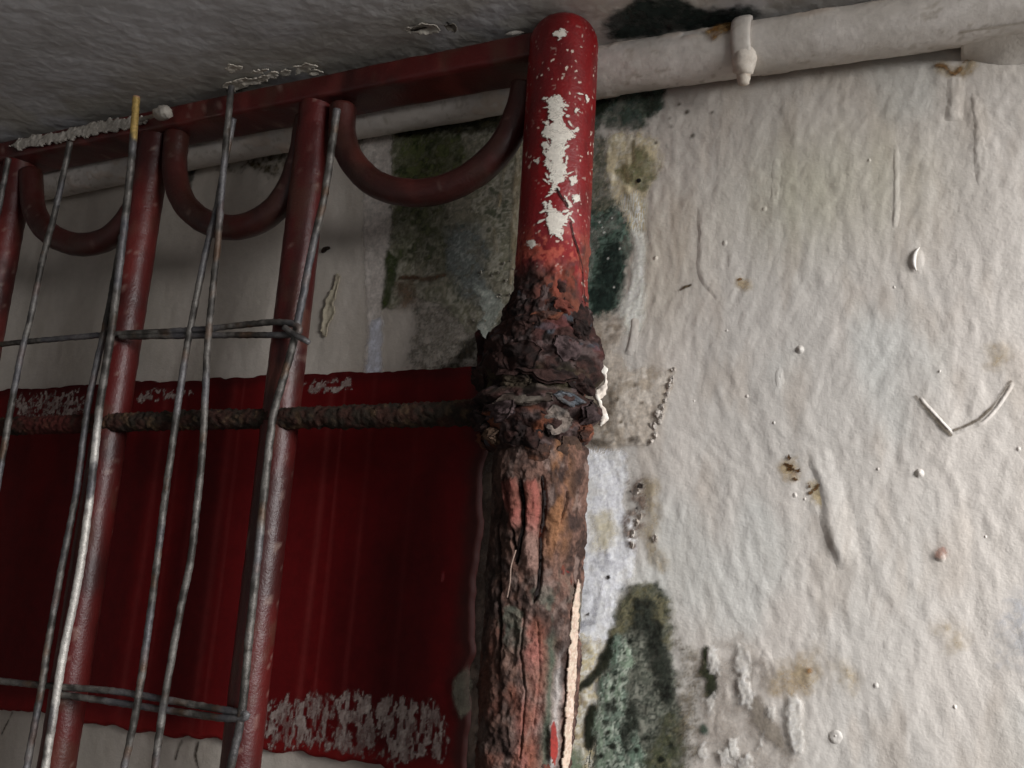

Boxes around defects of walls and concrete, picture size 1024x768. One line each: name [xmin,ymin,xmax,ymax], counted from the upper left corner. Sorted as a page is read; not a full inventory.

mould [604,0,758,39]
leakage [366,141,523,373]
leakage [391,115,502,179]
peeling [533,93,590,241]
leakage [588,89,666,331]
corrosion [470,297,615,461]
corrosion [781,454,822,504]
leakage [570,446,718,768]